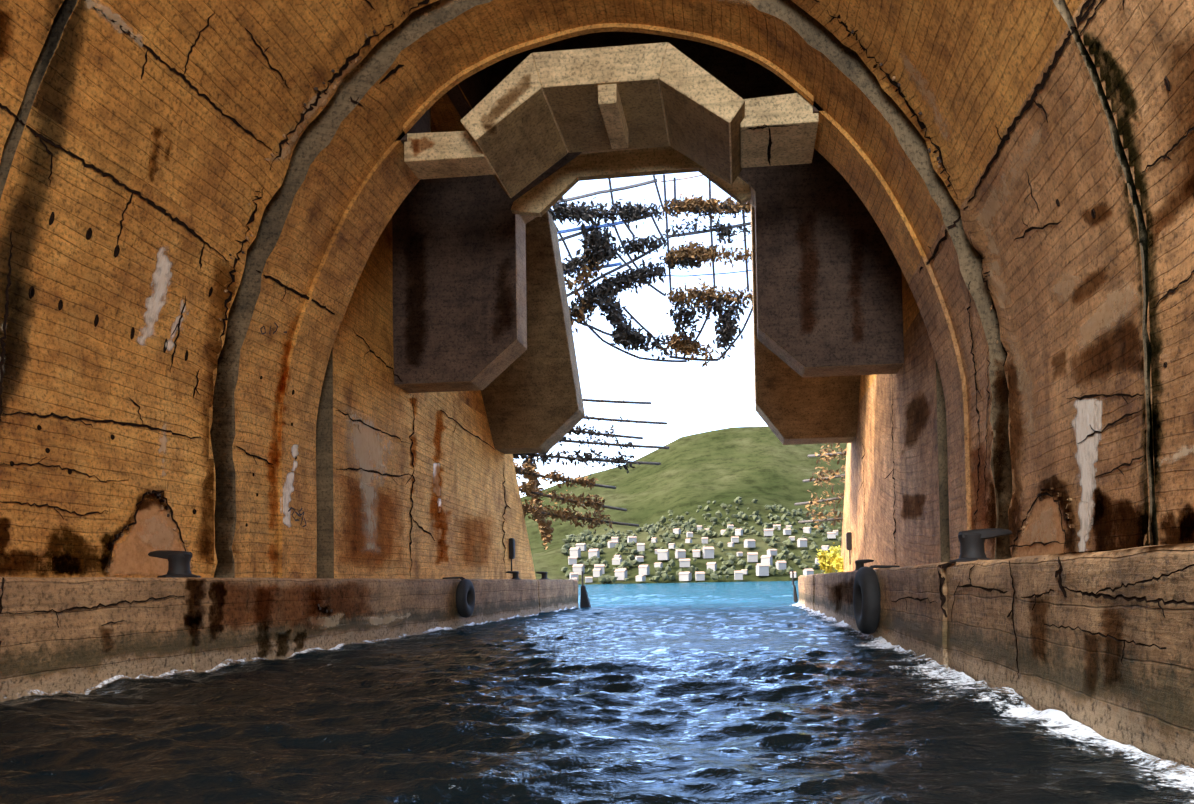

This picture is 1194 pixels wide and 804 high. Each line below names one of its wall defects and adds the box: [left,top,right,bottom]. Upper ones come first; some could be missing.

crack [0,103,229,269]
crack [85,0,272,150]
crack [919,0,1124,274]
leakage [1096,42,1137,120]
crack [0,232,204,440]
leakage [0,518,114,576]
spalling [107,489,191,577]
leakage [184,579,227,646]
leakage [257,624,307,658]
rust [431,412,448,560]
crack [892,561,1194,678]
leakage [1056,398,1194,555]